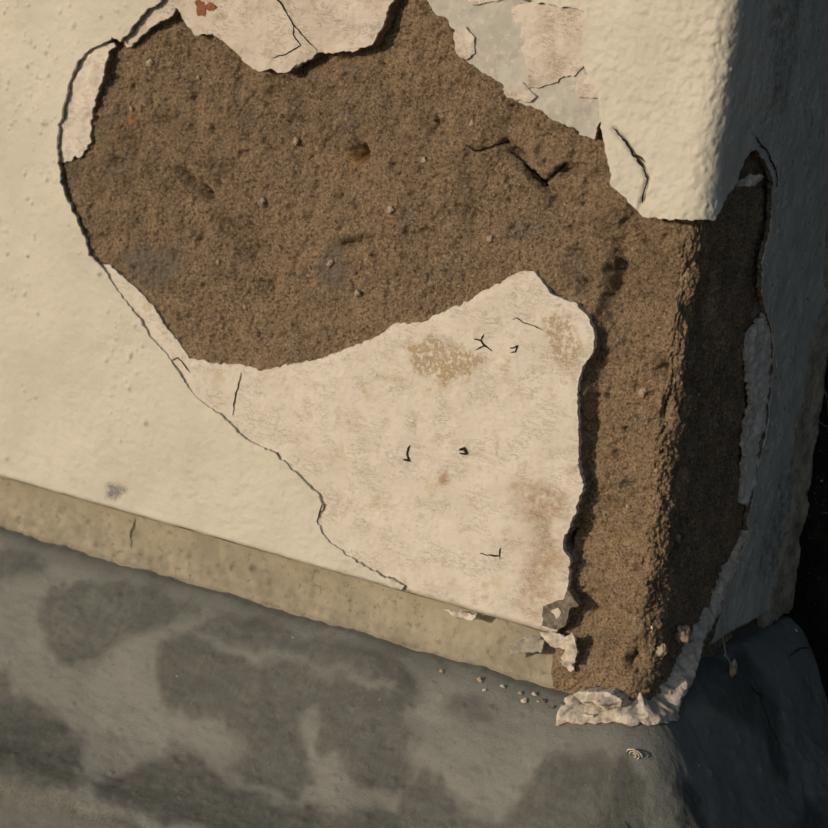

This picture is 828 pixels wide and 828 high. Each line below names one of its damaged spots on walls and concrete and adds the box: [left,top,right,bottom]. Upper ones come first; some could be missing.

crack [273,0,317,58]
crack [465,141,567,187]
crack [614,128,648,203]
flaking render [60,0,785,726]
water stain [0,674,75,789]
water stain [160,638,490,828]
water stain [99,760,332,828]